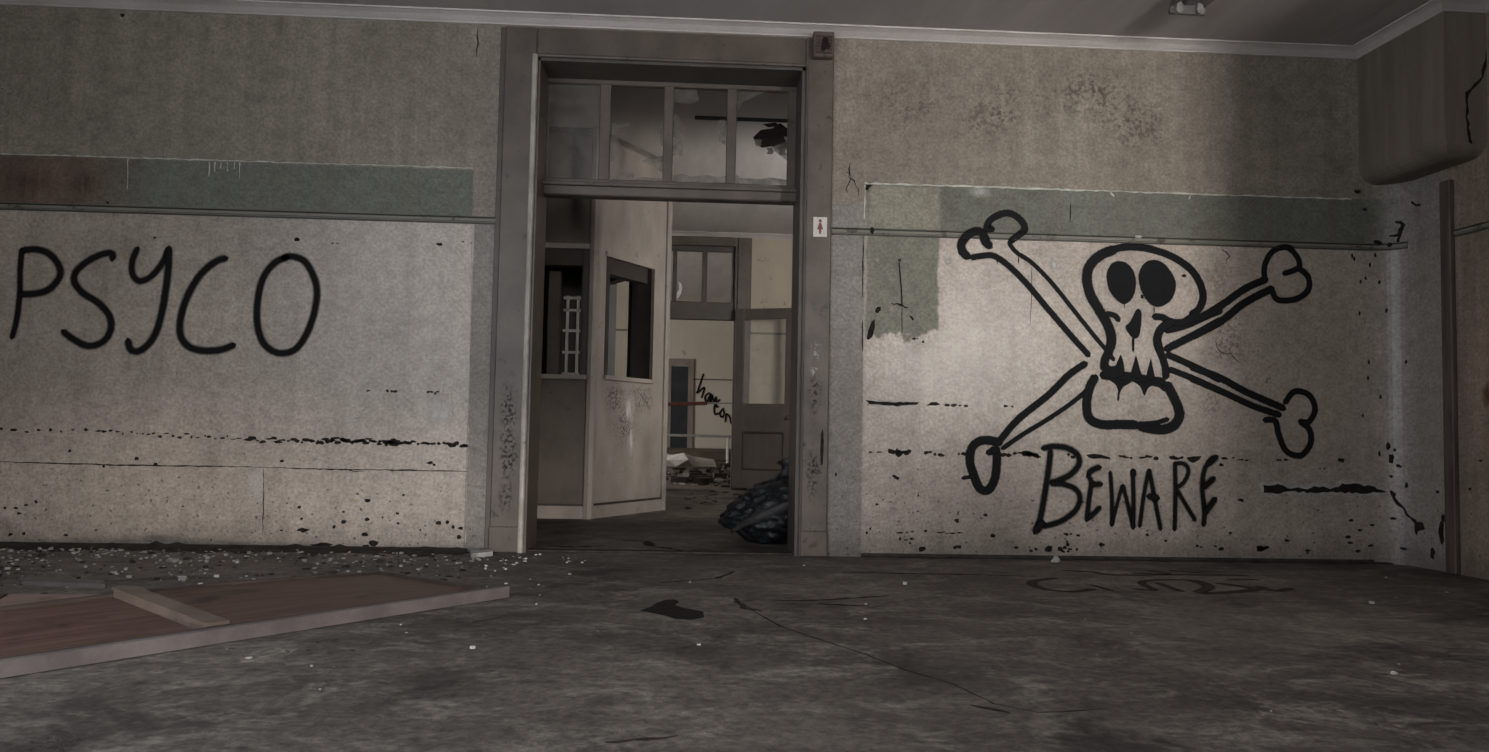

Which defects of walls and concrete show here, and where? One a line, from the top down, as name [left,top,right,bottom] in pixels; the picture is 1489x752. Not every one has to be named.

crack [1465,54,1487,144]
peeling [867,307,881,340]